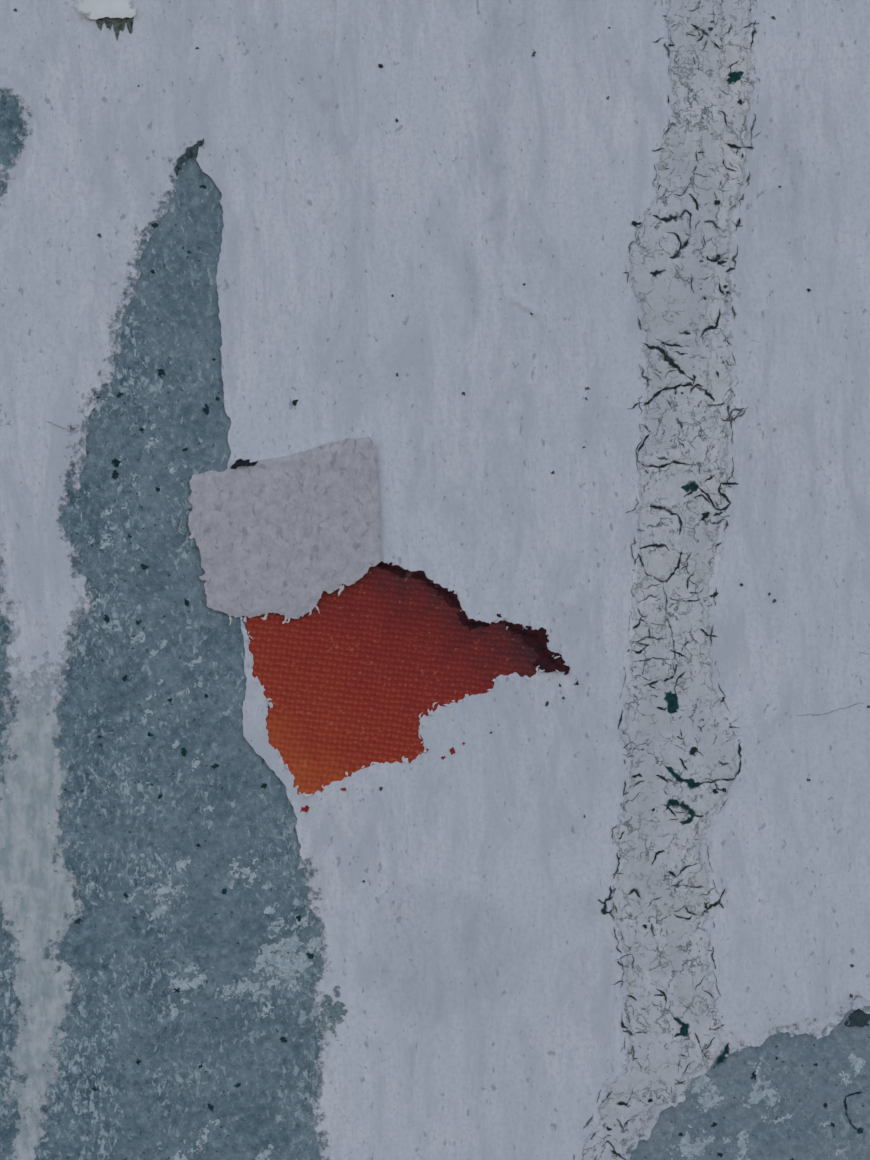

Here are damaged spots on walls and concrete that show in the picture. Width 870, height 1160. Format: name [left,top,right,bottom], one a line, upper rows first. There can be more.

peeling [56,149,329,1160]
crack [574,0,761,1160]
peeling [623,994,870,1160]